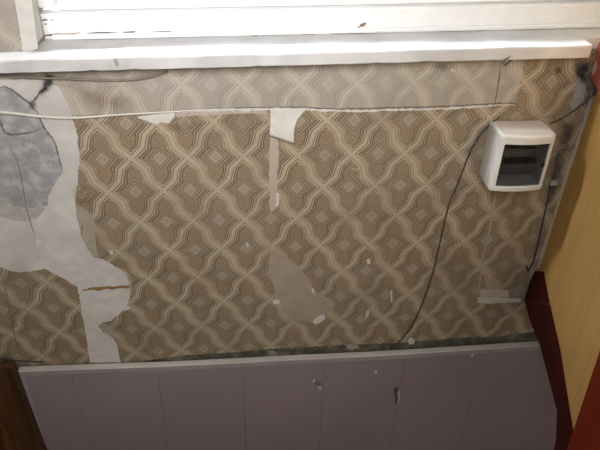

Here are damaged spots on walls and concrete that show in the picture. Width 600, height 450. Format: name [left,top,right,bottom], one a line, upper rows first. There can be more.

damp [576,64,590,106]
spalling [0,86,62,222]